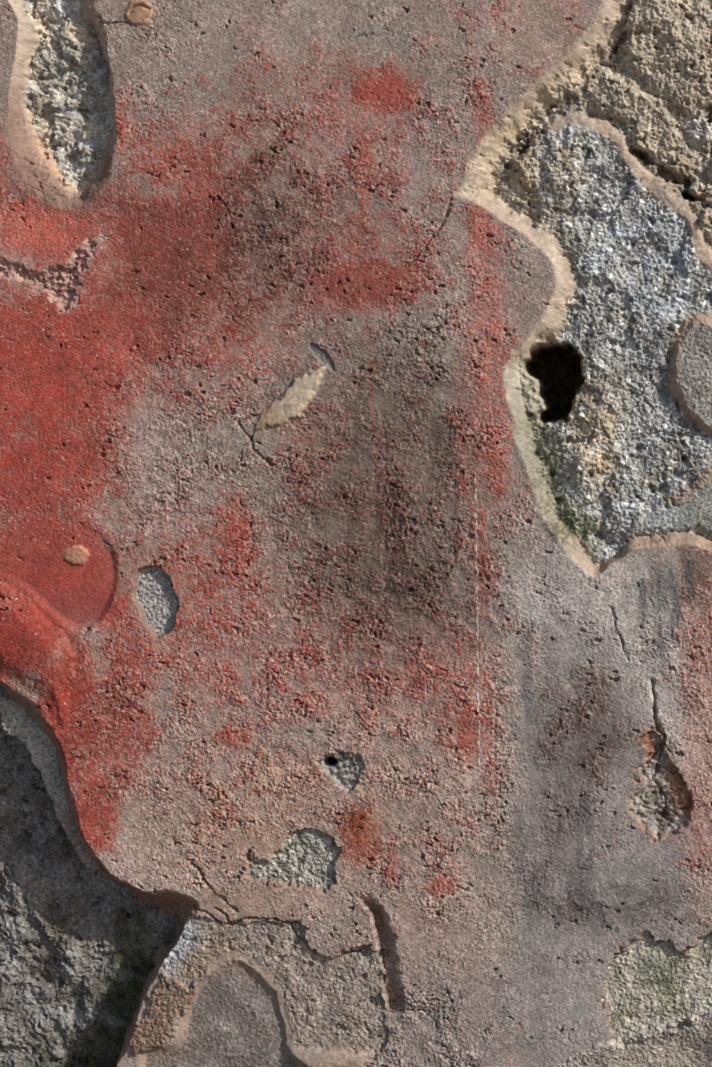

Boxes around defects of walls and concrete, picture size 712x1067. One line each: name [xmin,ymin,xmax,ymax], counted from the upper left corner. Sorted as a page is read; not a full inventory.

spalling [4,0,119,212]
spalling [452,0,712,577]
peeling [0,513,118,631]
spalling [132,565,180,639]
crack [611,608,630,660]
spalling [628,726,695,844]
spalling [0,681,406,1067]
crack [191,862,307,943]
spalling [594,931,712,1051]